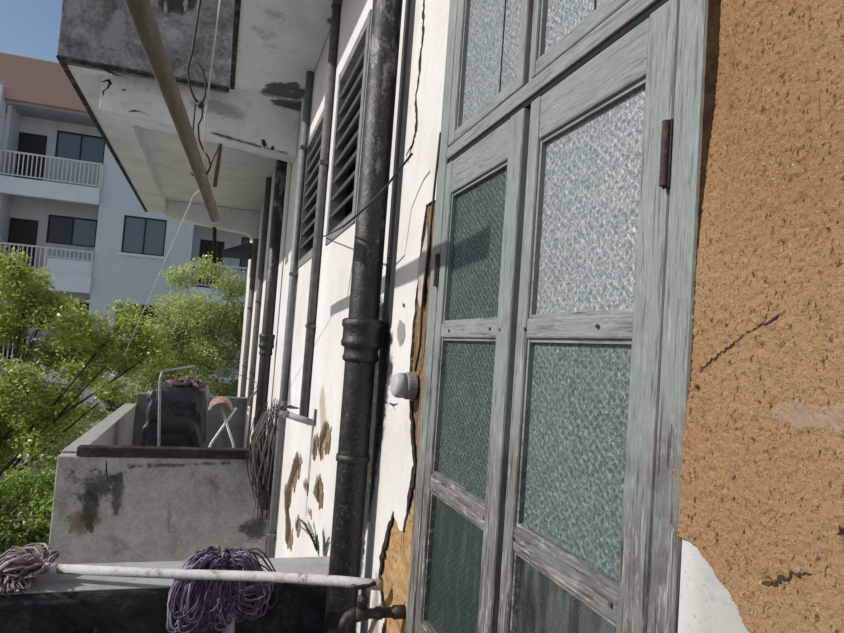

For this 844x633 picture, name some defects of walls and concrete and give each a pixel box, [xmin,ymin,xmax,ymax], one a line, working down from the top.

leakage [261,82,305,111]
flaking render [669,0,844,633]
flaking render [312,420,331,461]
flaking render [378,200,436,633]
leakage [71,468,124,533]
flaking render [284,451,323,551]